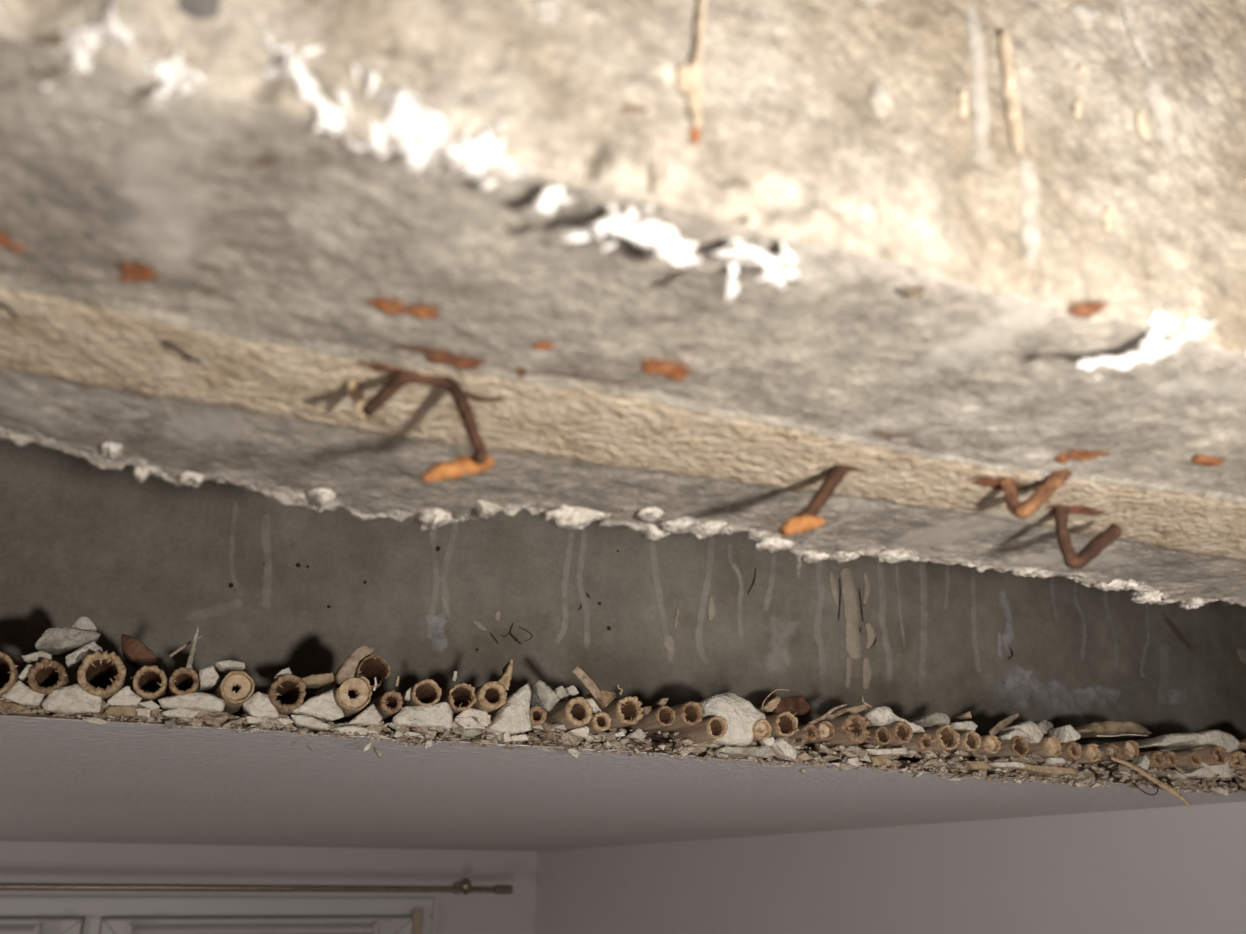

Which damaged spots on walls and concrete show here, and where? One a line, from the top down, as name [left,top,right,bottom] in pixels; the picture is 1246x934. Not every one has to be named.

water stain [255,17,533,189]
water stain [527,184,576,214]
water stain [560,205,799,300]
rust [393,347,482,370]
water stain [1077,310,1216,381]
rust [421,453,495,483]
rust [974,476,1028,490]
rust [1046,505,1105,515]
rust [778,515,825,537]
peeling [829,567,876,690]
peeling [566,748,580,758]
peeling [1209,787,1229,796]